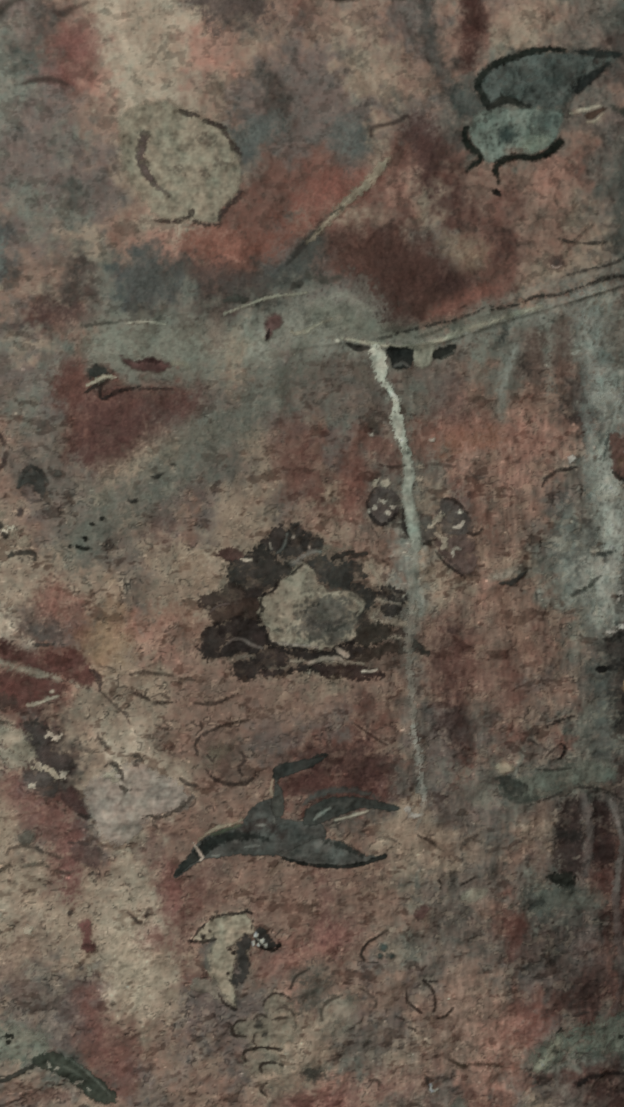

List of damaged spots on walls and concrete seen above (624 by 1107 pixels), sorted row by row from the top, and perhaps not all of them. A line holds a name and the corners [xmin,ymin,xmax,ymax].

spalling [386,346,414,369]
spalling [432,344,456,359]
water stain [368,344,427,828]